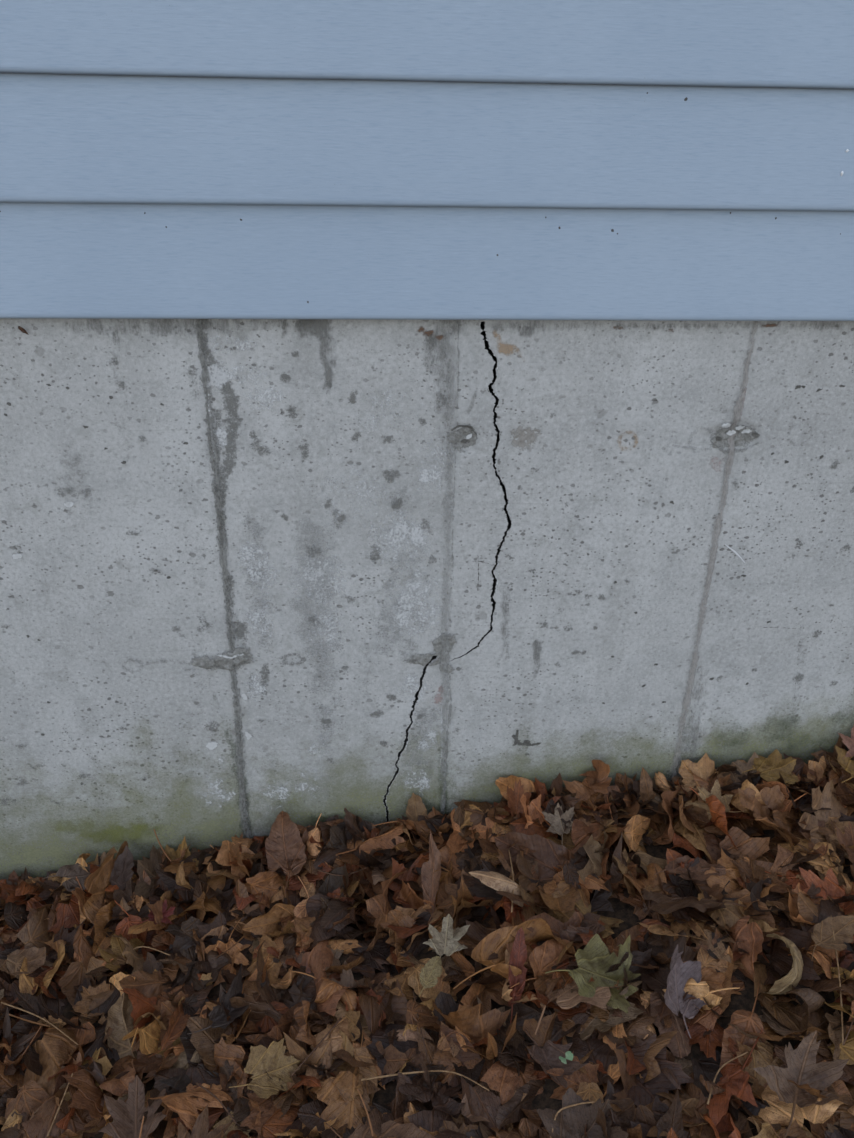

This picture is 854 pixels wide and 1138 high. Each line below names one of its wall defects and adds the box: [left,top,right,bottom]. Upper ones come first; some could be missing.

crack [383,321,512,822]